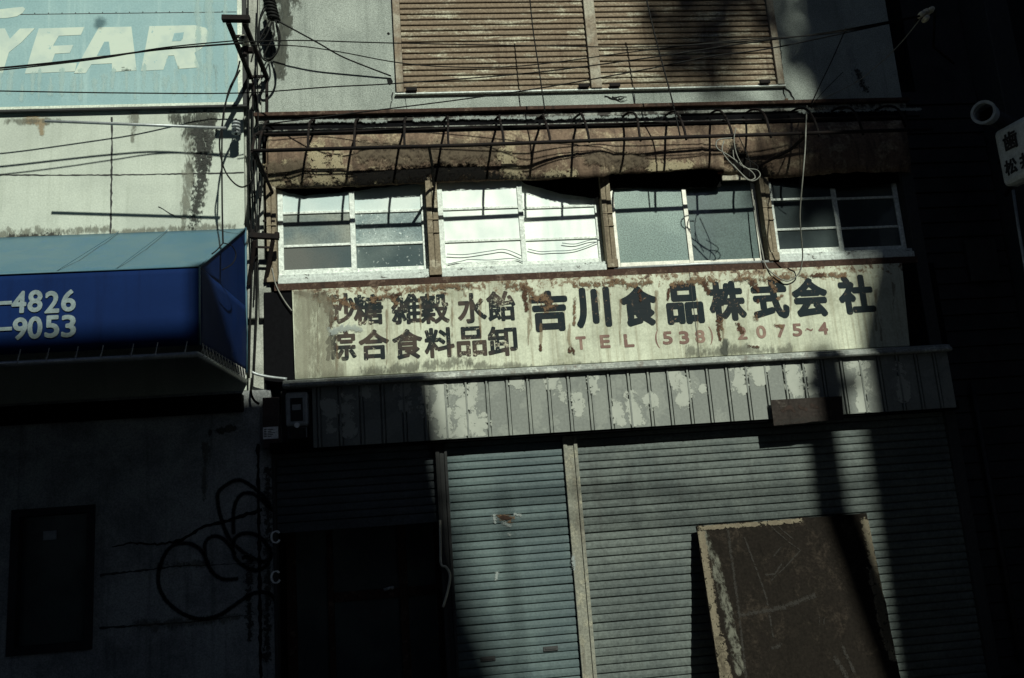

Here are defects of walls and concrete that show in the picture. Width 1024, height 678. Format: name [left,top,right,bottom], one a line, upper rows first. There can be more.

leakage [0,0,236,237]
corrosion [499,281,558,313]
corrosion [572,278,653,326]
corrosion [666,275,718,300]
corrosion [733,272,847,321]
corrosion [716,314,760,348]
peeling [416,379,492,439]
peeling [543,373,600,417]
peeling [609,390,659,427]
peeling [668,368,707,409]
peeling [728,360,820,399]
peeling [846,358,874,412]